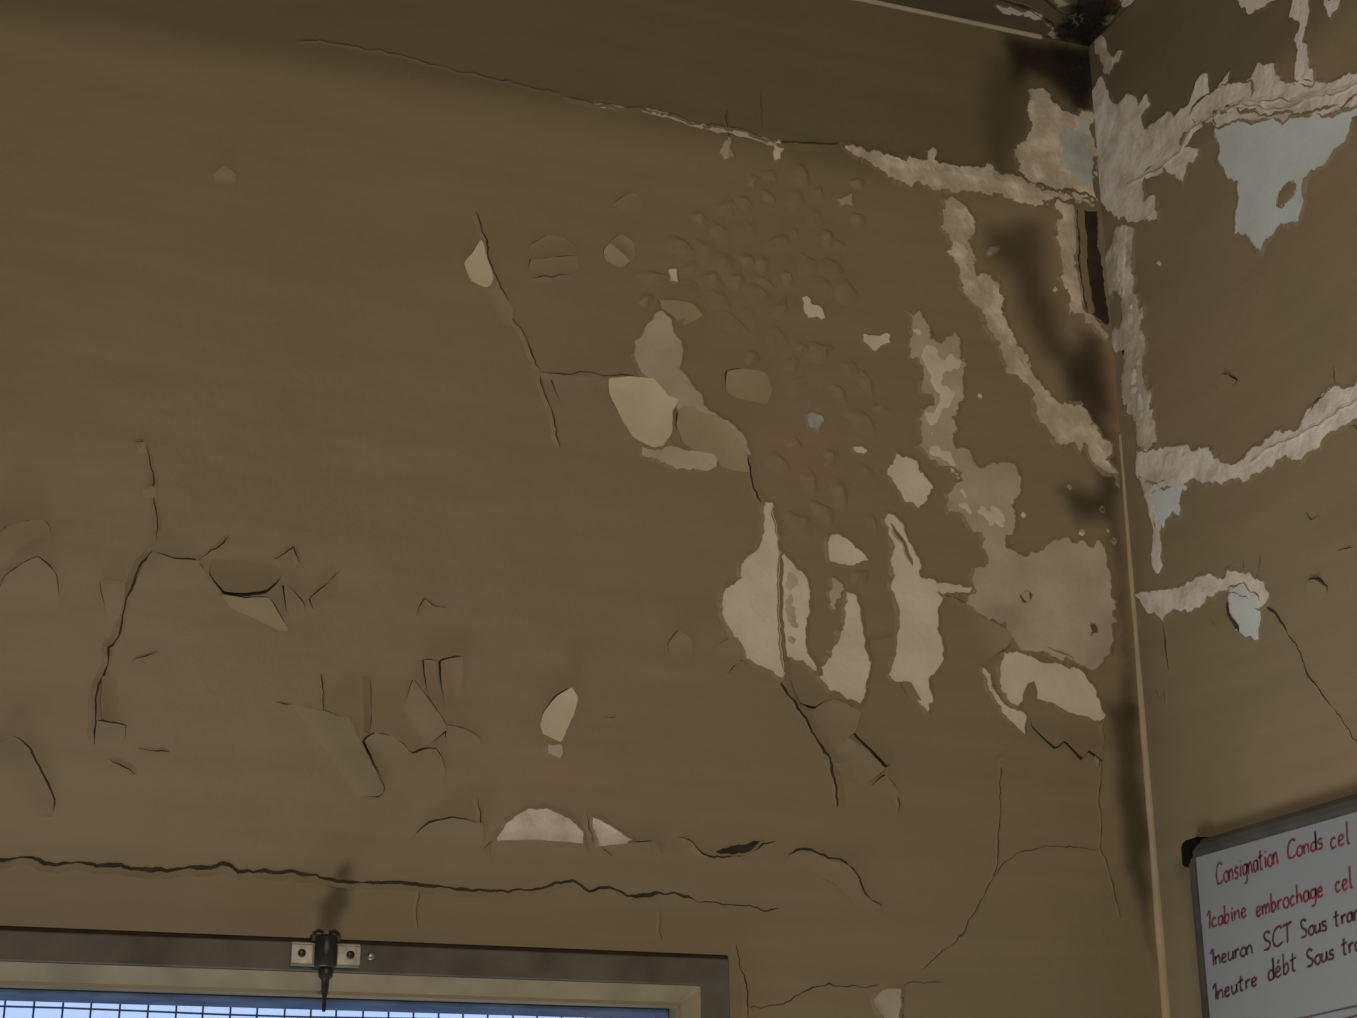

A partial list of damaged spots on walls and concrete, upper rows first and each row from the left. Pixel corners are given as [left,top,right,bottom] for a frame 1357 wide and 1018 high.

crack [294,38,842,163]
peeling [835,0,1357,671]
peeling [464,211,1119,814]
peeling [87,438,342,777]
peeling [276,655,482,797]
crack [1265,604,1357,746]
crack [0,854,780,941]
peeling [411,798,661,864]
peeling [678,835,883,917]
crack [731,732,1122,1018]